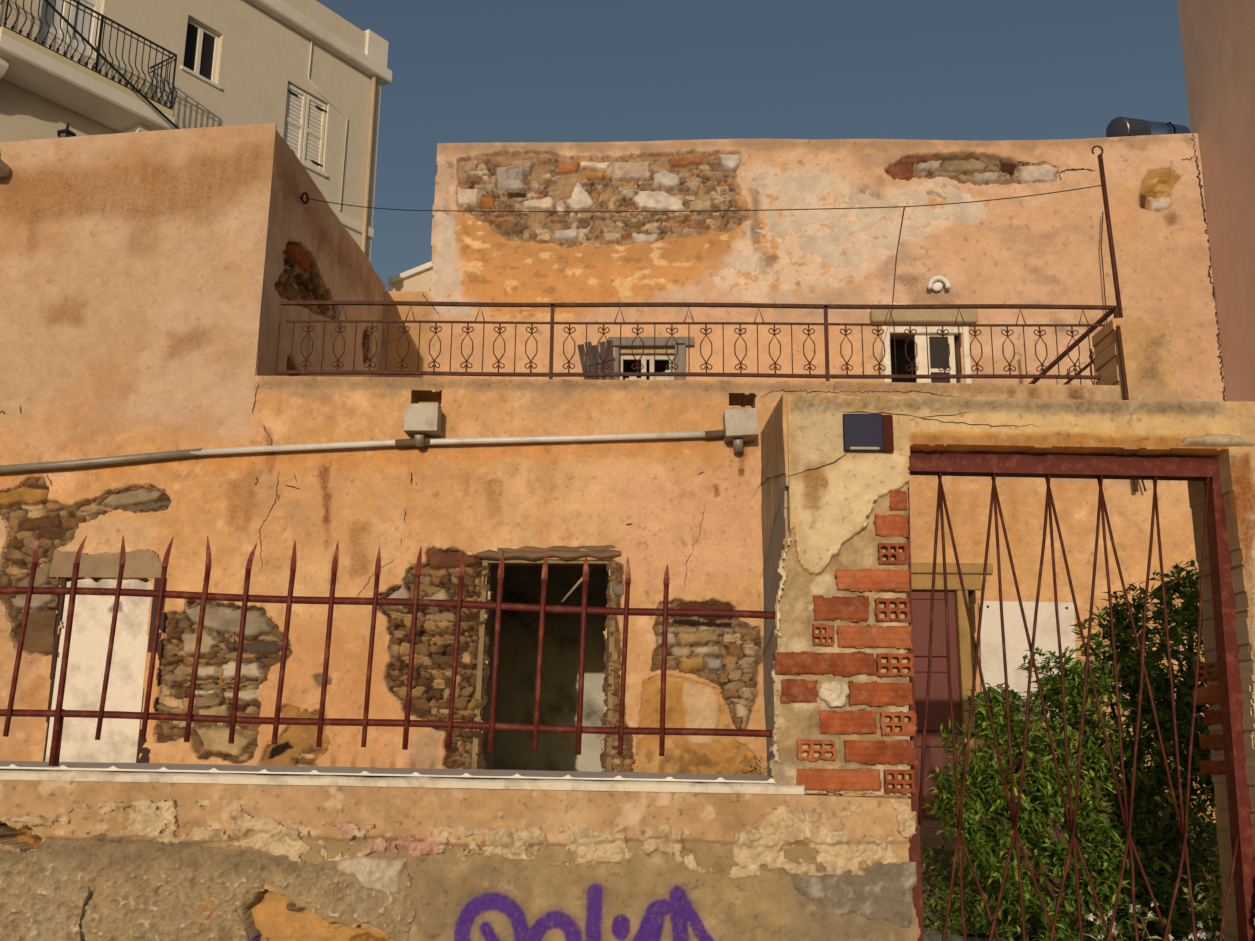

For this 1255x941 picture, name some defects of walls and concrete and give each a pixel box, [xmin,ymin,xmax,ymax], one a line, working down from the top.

flaking render [274,240,340,323]
flaking render [430,149,1060,319]
crack [1182,133,1225,401]
crack [252,382,280,567]
flaking render [0,477,918,928]
flaking render [250,885,393,941]